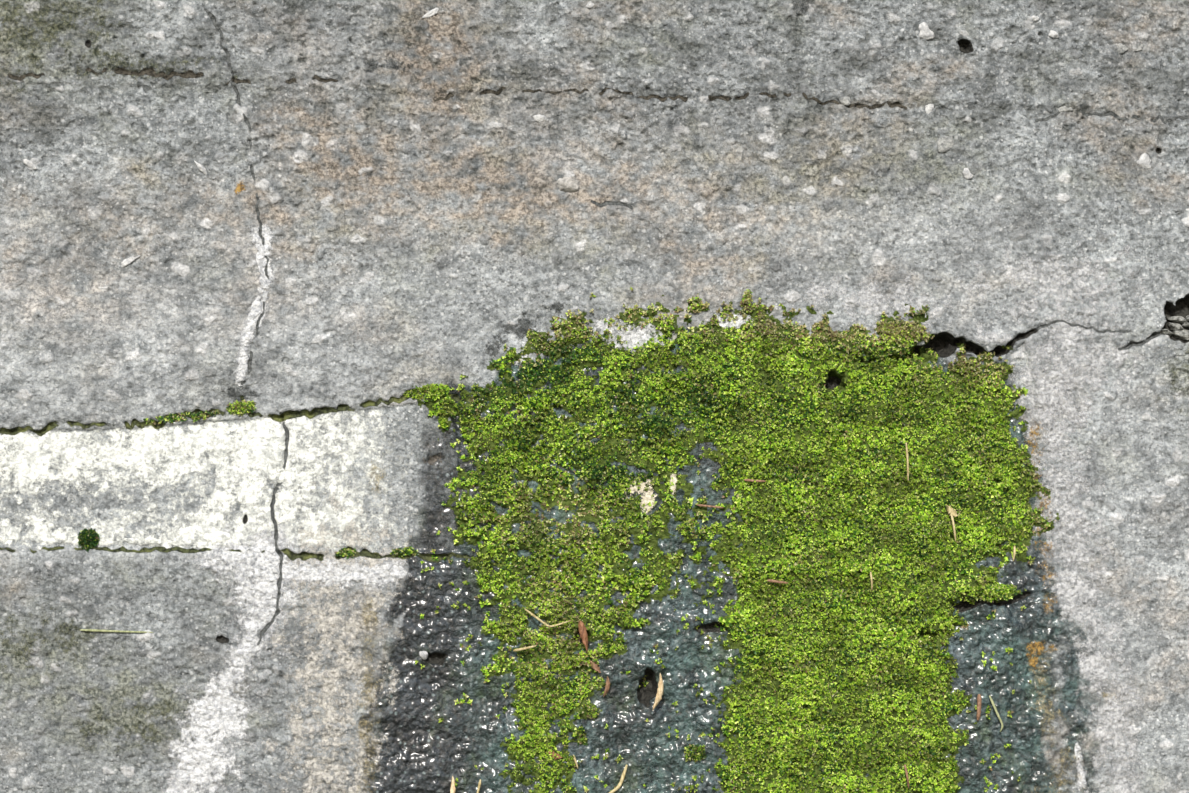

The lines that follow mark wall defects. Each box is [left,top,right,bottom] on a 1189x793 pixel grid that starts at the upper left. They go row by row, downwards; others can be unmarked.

crack [0,4,496,645]
water stain [165,302,750,793]
water stain [793,276,952,328]
crack [913,320,1162,358]
water stain [941,244,1143,793]
spalling [1160,294,1189,343]